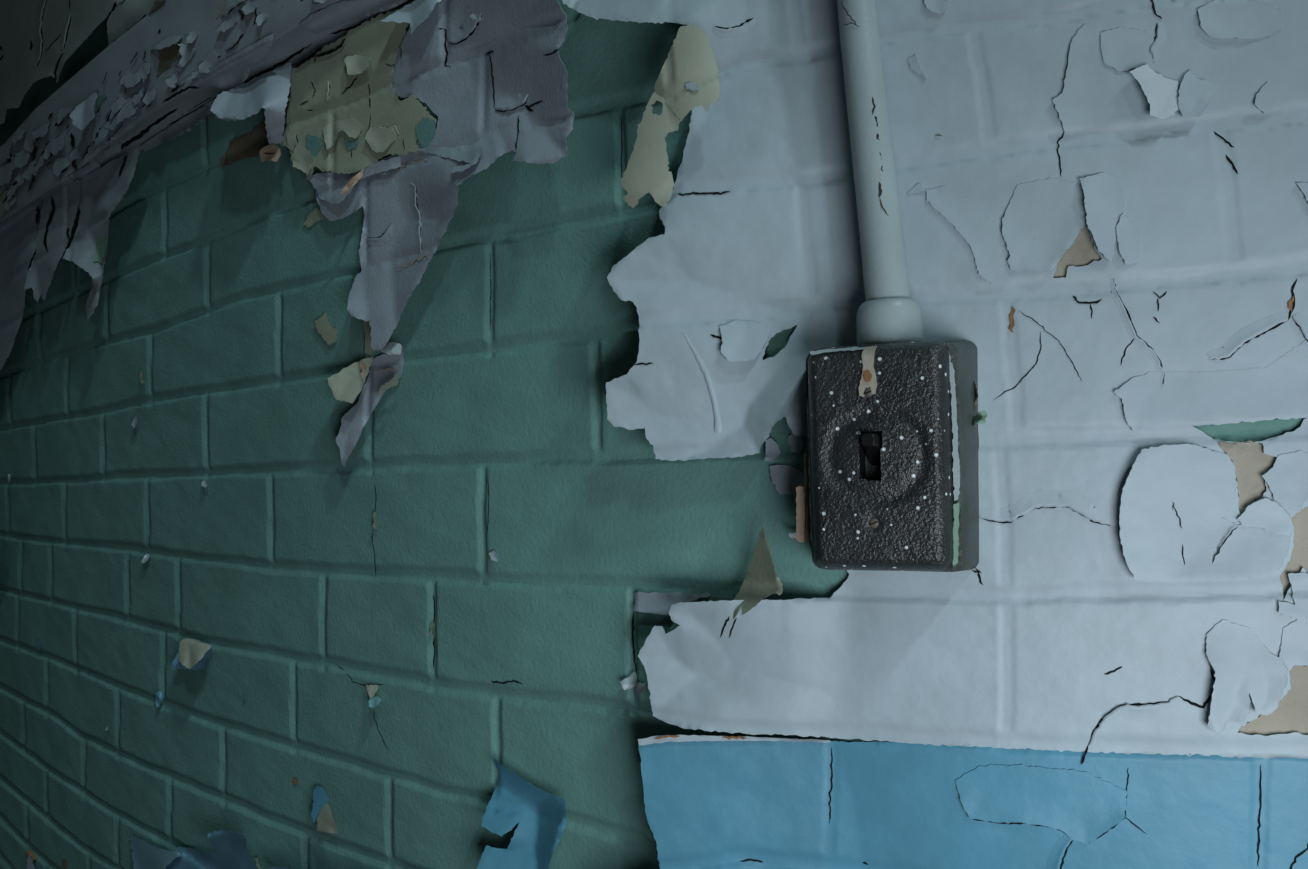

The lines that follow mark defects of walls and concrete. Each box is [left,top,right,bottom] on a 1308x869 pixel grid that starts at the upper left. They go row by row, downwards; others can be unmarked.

crack [1214,131,1238,174]
peeling [0,0,866,498]
crack [994,311,1082,400]
crack [1073,279,1167,387]
peeling [620,0,1308,869]
crack [1172,500,1238,564]
peeling [170,639,212,670]
crack [1081,664,1216,765]
peeling [130,830,289,869]
peeling [311,786,338,833]
peeling [477,756,568,869]
crack [1255,767,1263,863]